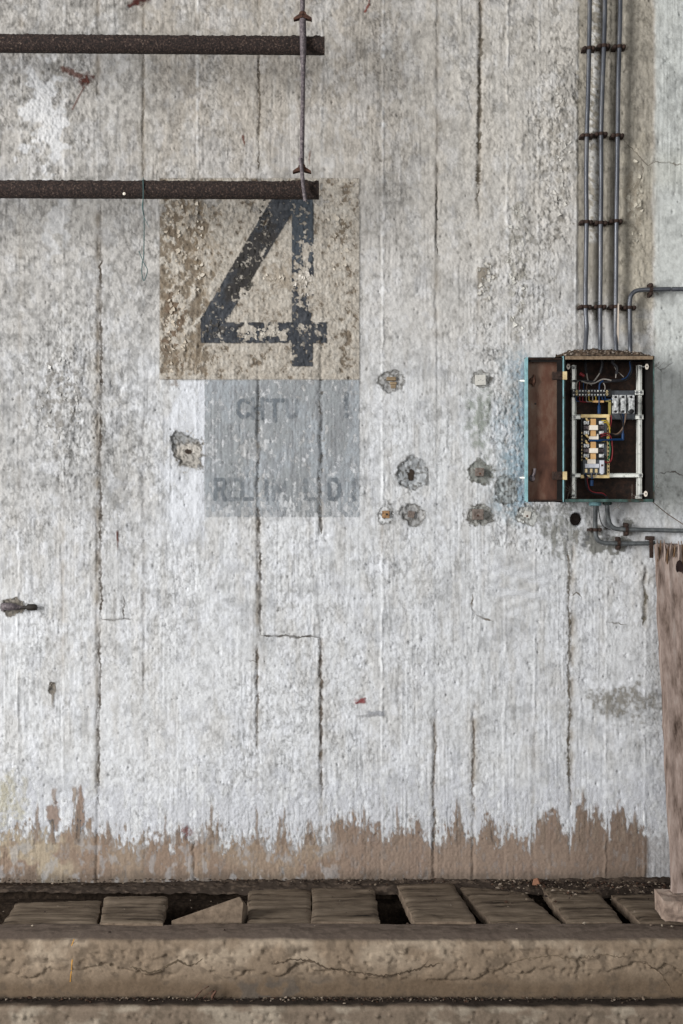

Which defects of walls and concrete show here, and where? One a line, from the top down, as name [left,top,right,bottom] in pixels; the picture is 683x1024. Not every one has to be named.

crack [475,2,483,201]
spalling [377,369,405,393]
spalling [170,430,205,473]
spalling [394,455,429,490]
spalling [462,458,537,527]
spalling [377,499,426,527]
water stain [0,769,666,883]
crack [131,958,203,975]
crack [272,956,440,978]
crack [479,954,672,992]